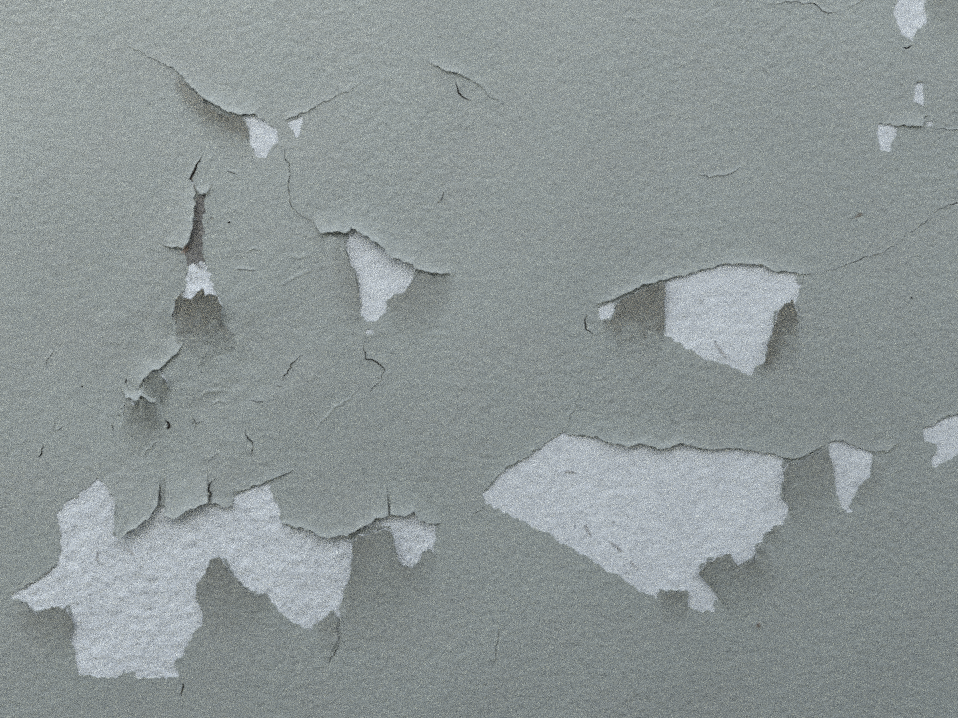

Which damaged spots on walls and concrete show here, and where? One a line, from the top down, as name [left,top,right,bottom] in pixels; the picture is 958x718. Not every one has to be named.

peeling [893,0,958,49]
peeling [876,72,958,152]
peeling [126,35,456,394]
crack [817,199,958,273]
peeling [584,245,817,378]
peeling [10,155,443,679]
peeling [923,403,958,468]
peeling [472,391,900,625]